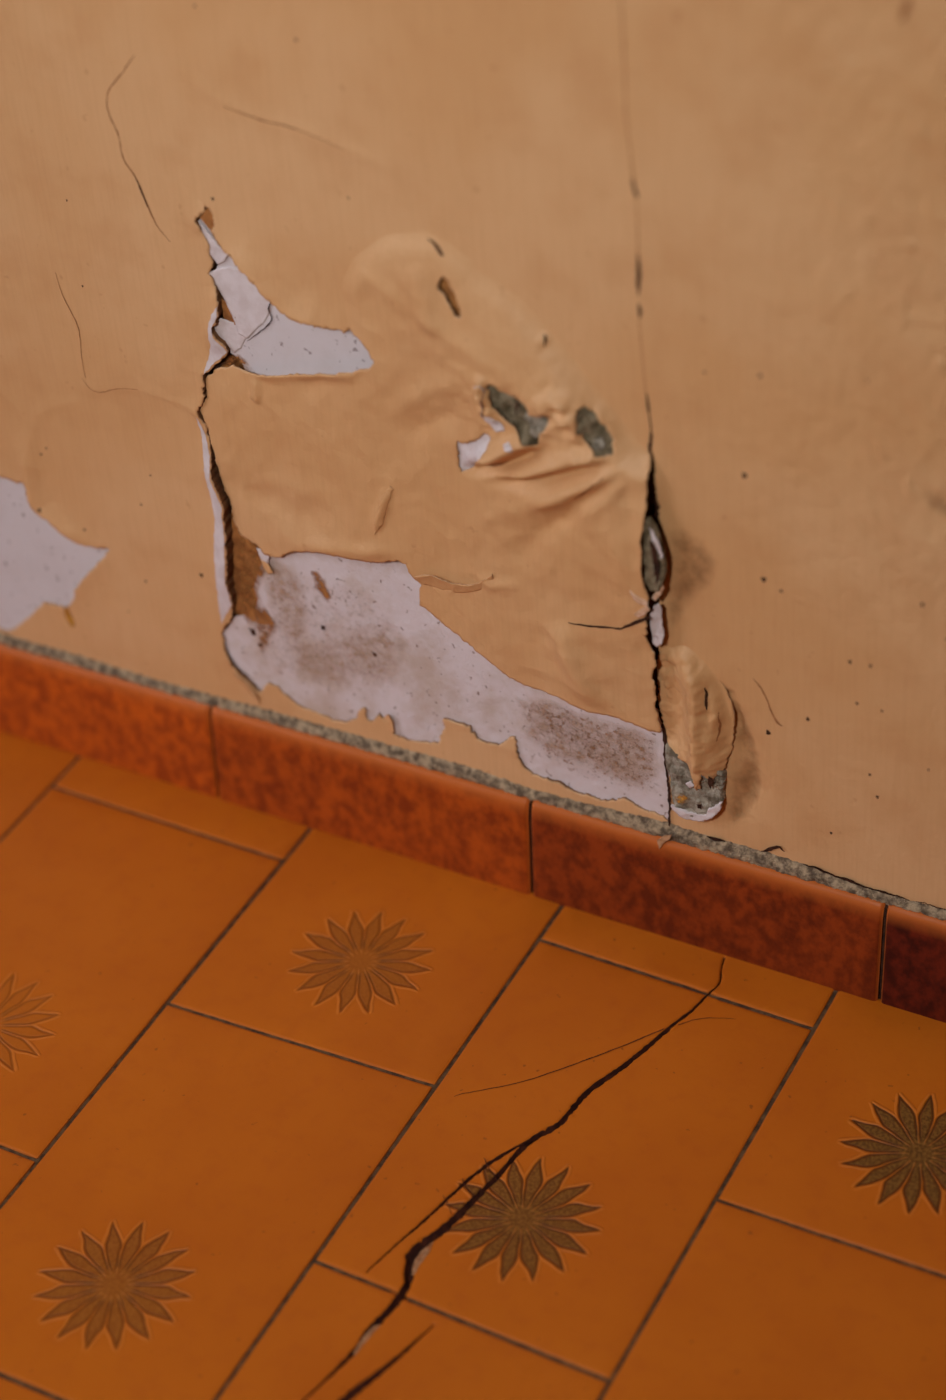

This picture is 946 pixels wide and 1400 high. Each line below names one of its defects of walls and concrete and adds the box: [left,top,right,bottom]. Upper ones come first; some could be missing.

crack [106,55,168,239]
peeling [198,197,374,376]
crack [620,0,672,826]
peeling [0,477,109,631]
peeling [223,514,727,850]
crack [753,679,782,726]
crack [761,845,946,910]
crack [303,959,733,1400]